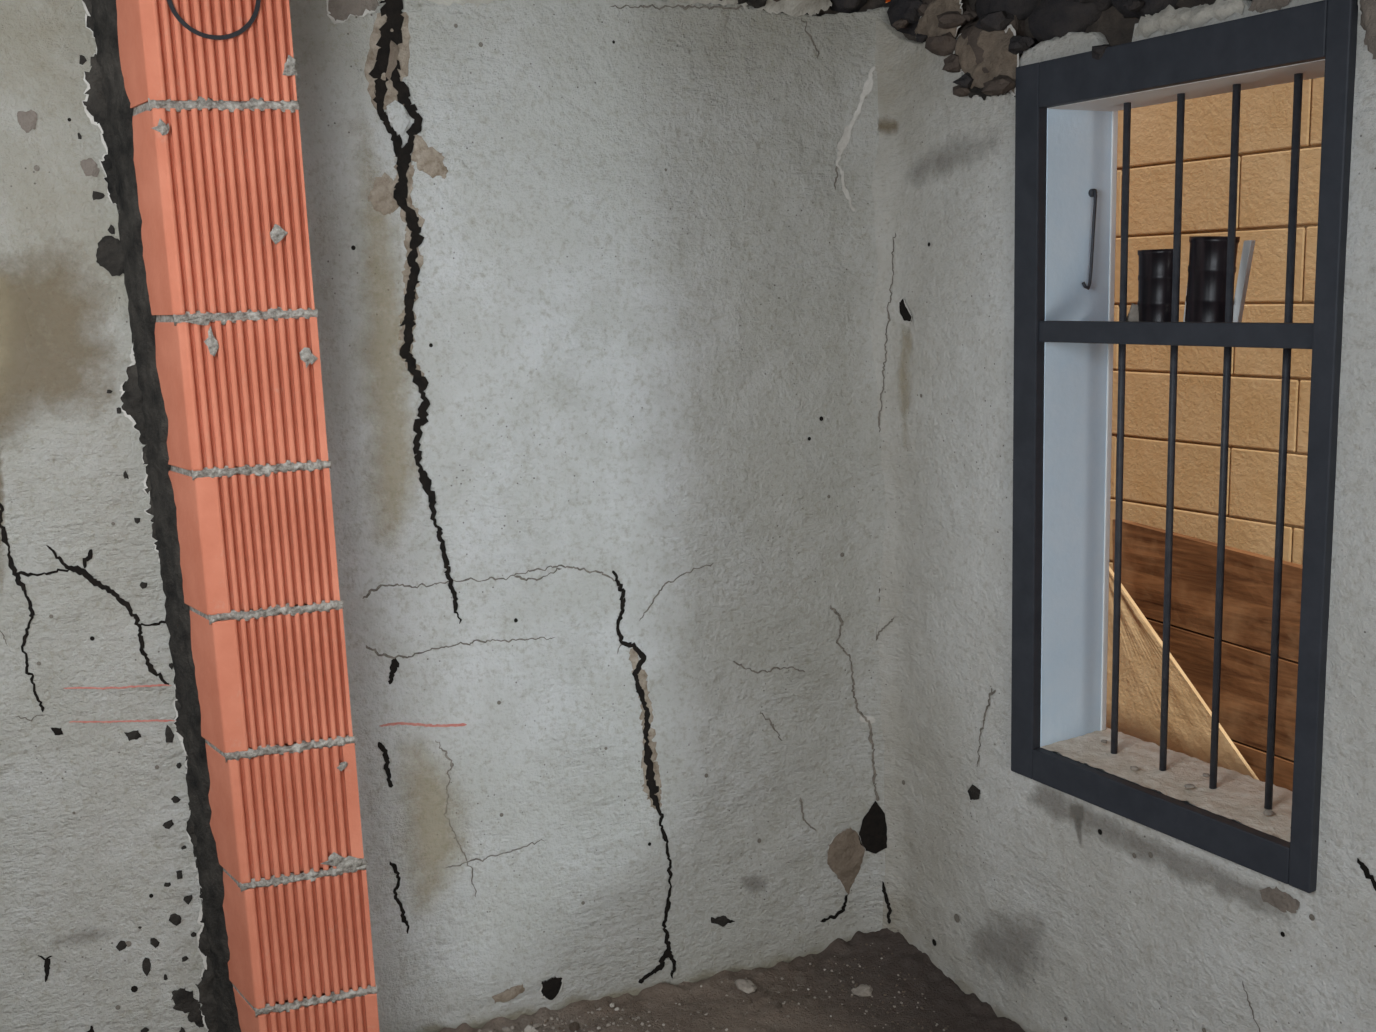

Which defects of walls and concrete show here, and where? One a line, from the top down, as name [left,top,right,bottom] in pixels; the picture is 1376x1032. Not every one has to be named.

spalling [68,0,117,204]
spalling [720,0,780,8]
spalling [892,0,1037,100]
water stain [0,269,100,427]
spalling [107,344,160,562]
crack [363,0,713,984]
crack [0,503,169,722]
spalling [124,730,141,741]
spalling [165,663,187,774]
spalling [116,796,219,1032]
spalling [827,827,866,895]
crack [1357,858,1376,891]